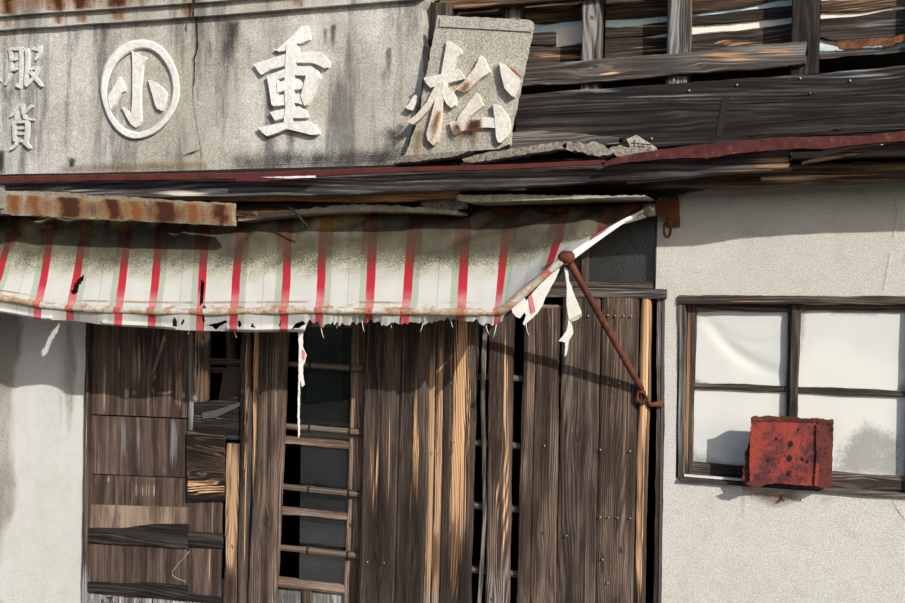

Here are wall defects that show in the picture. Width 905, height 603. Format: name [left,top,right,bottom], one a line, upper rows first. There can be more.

rust [1,0,126,26]
rust [823,34,905,50]
crack [182,0,203,170]
rust [453,118,482,146]
rust [8,194,230,224]
water stain [0,313,18,410]